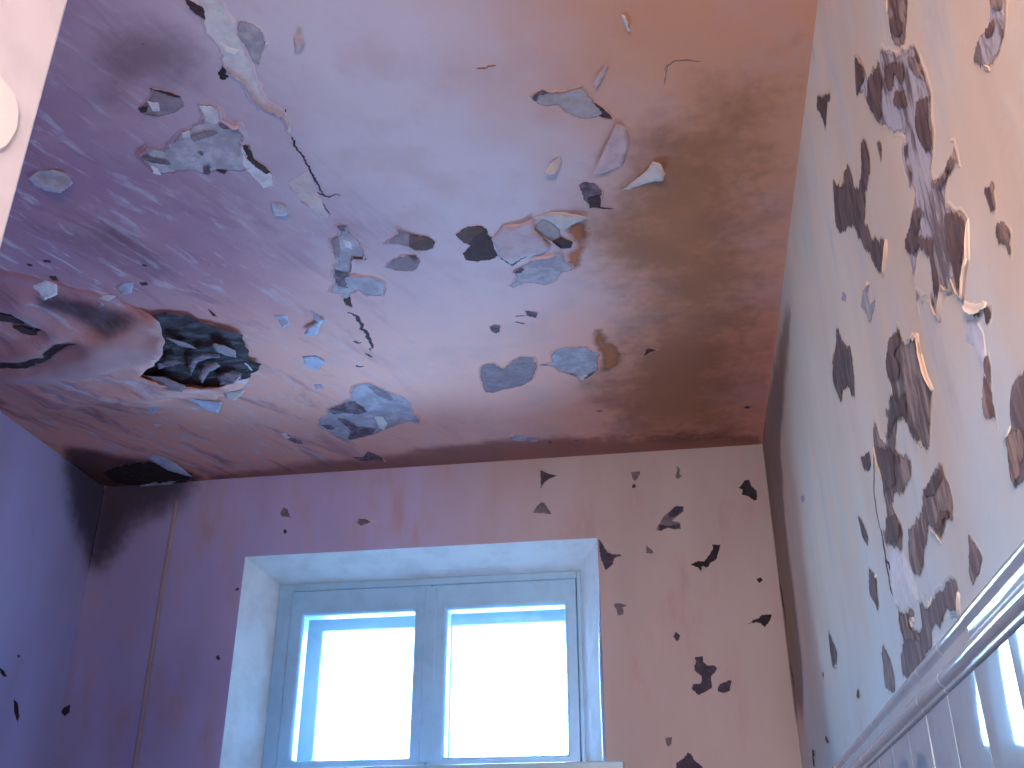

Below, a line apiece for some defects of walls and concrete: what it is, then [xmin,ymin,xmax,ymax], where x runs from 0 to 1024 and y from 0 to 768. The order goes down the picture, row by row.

peeling [185,0,295,137]
peeling [134,88,275,189]
crack [284,109,340,215]
peeling [454,64,630,289]
peeling [832,0,1024,492]
leakage [67,450,198,562]
spalling [103,455,199,486]
crack [348,312,374,367]
peeling [315,382,425,463]
peeling [477,346,601,394]
peeling [861,321,984,695]
peeling [691,655,732,696]